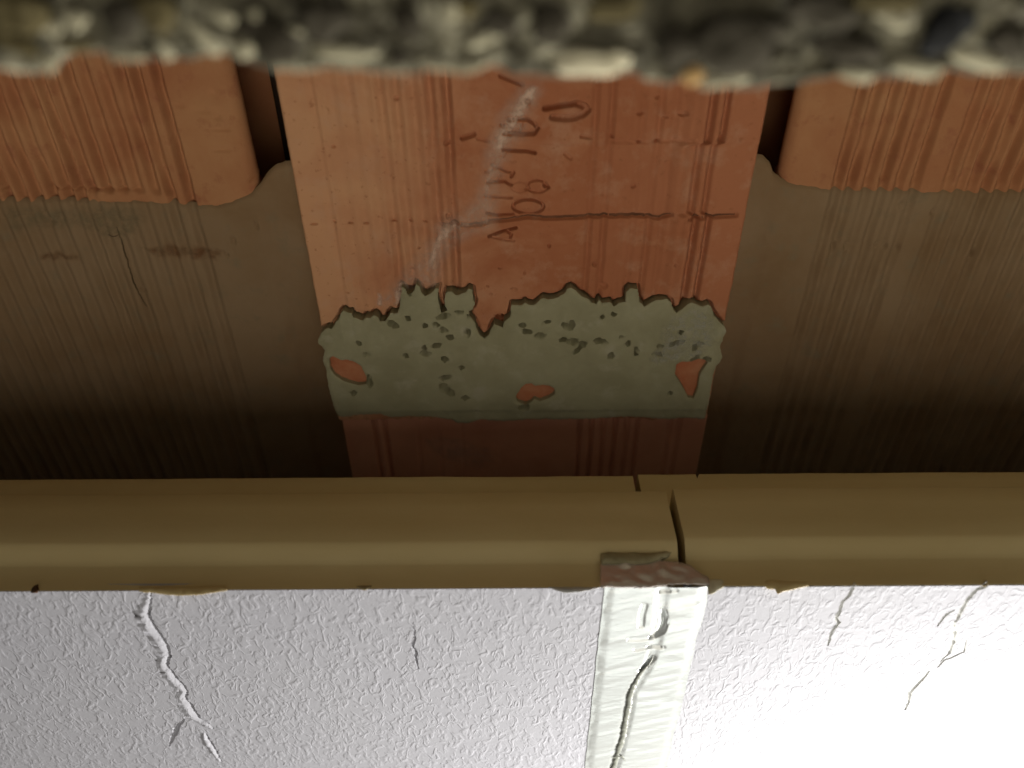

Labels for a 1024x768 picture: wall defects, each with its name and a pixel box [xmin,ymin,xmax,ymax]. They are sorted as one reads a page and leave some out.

leakage [487,88,535,183]
spalling [330,356,366,382]
spalling [675,359,706,396]
crack [132,592,222,762]
crack [827,582,857,646]
crack [905,580,990,710]